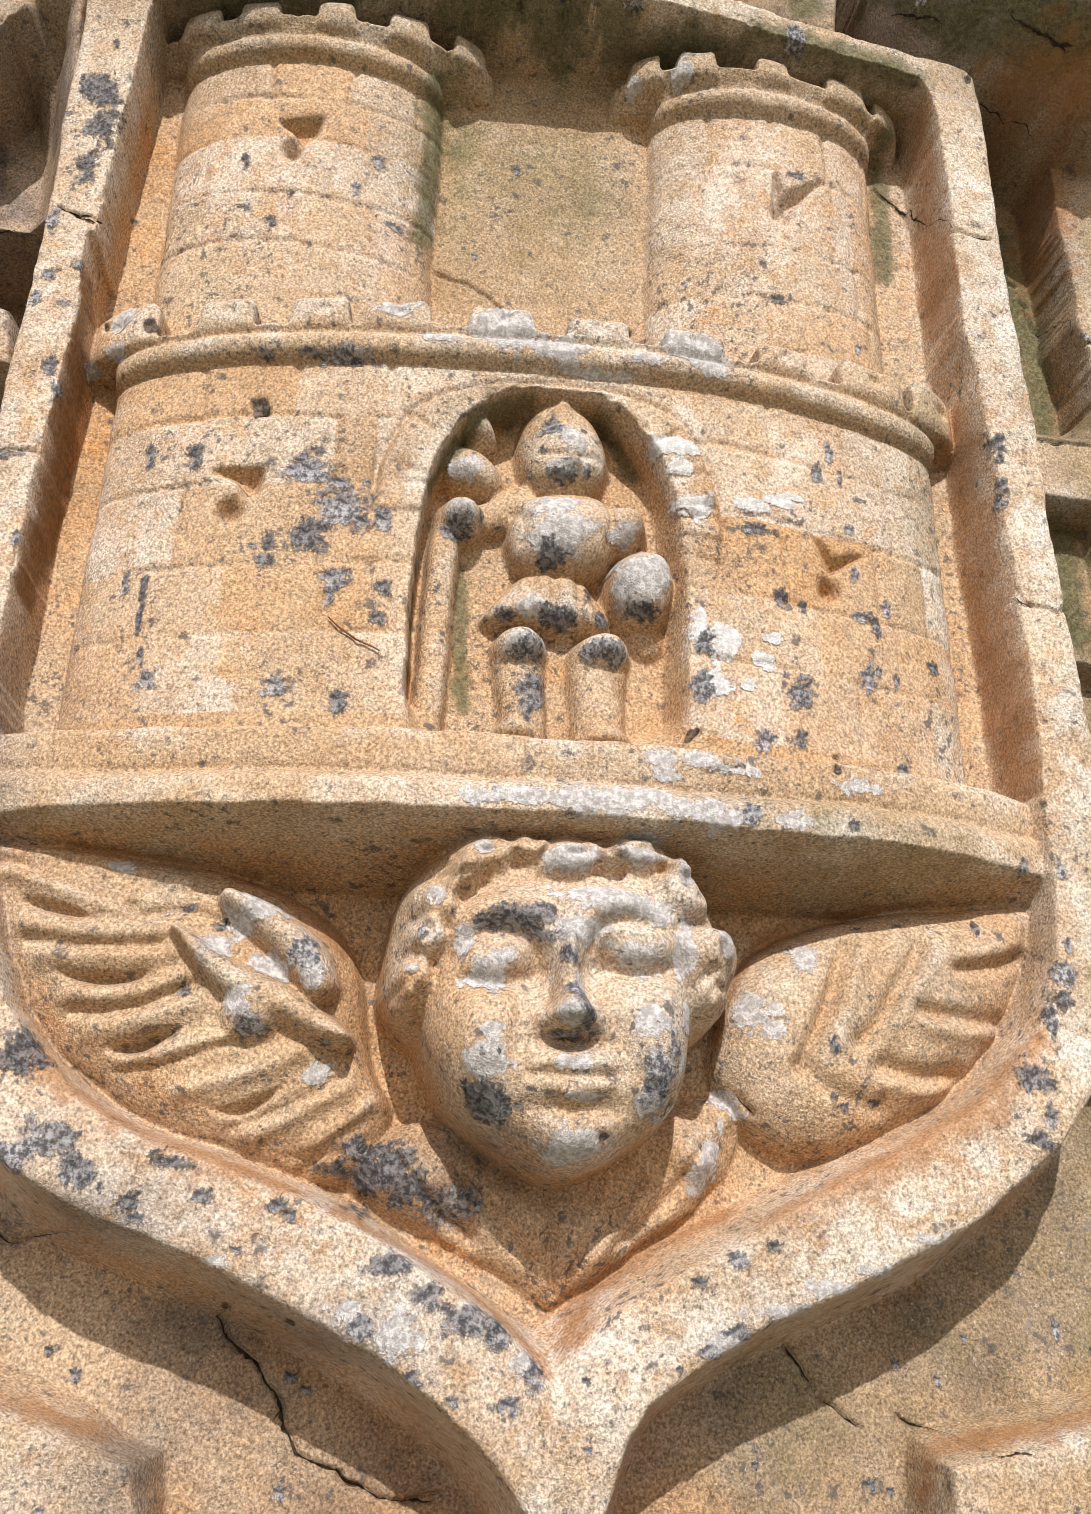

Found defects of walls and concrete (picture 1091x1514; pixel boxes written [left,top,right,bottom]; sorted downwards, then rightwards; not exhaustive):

crack [978,103,1031,136]
crack [216,1303,435,1503]